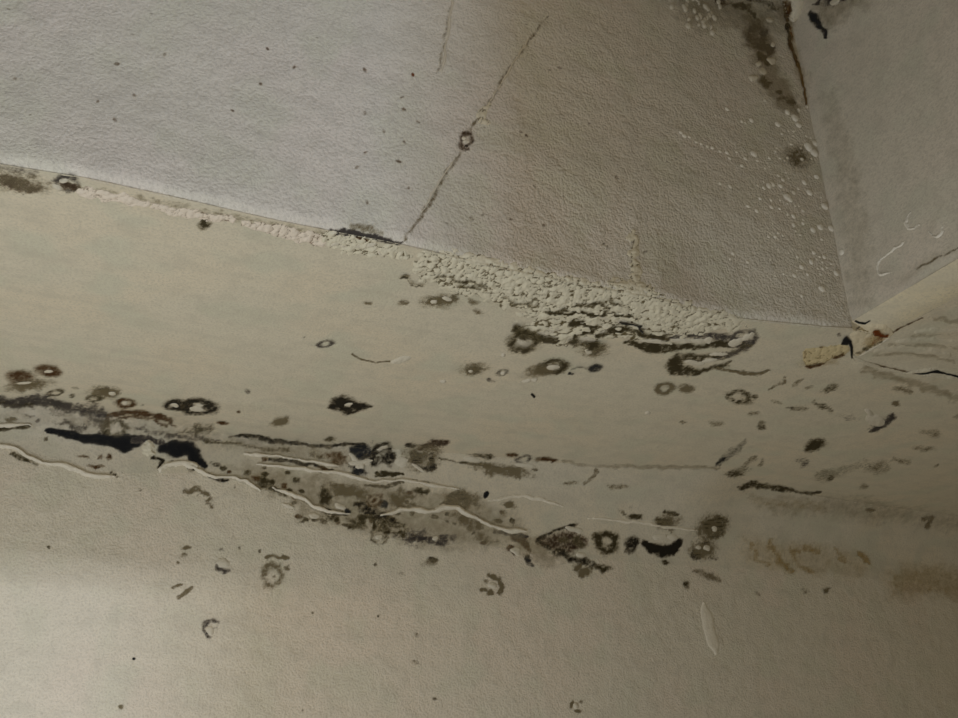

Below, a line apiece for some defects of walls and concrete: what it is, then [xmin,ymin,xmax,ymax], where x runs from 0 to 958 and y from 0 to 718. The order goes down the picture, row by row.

leakage [808,0,844,39]
mould [507,320,770,395]
spalling [803,333,890,369]
crack [853,355,958,380]
peeling [0,422,32,431]
peeling [0,443,116,479]
peeling [193,466,350,516]
leakage [0,363,557,546]
peeling [243,452,460,490]
mould [716,449,822,495]
leakage [507,510,729,582]
leakage [258,550,290,588]